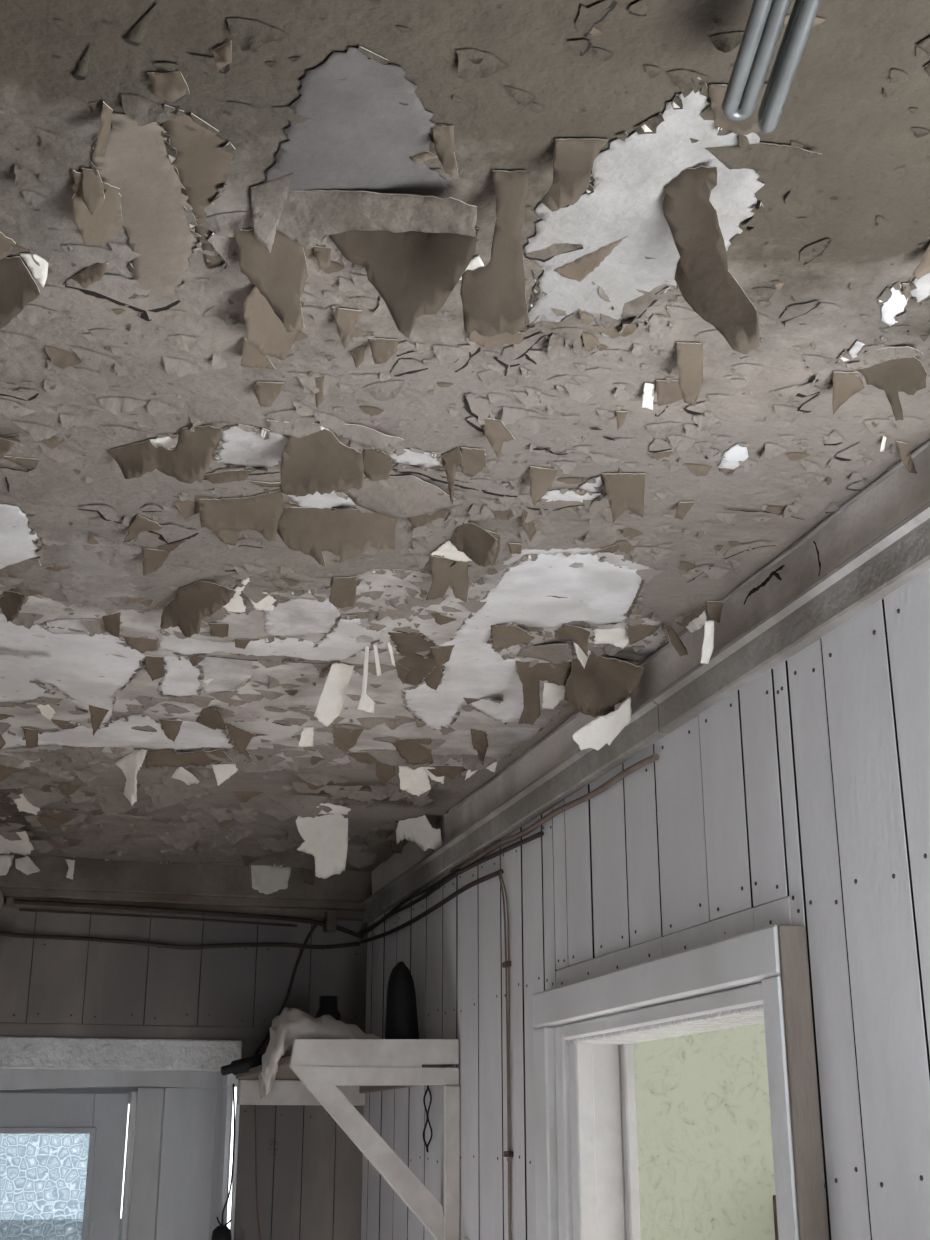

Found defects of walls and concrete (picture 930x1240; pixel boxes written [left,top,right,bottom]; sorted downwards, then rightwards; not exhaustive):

peeling [212,17,290,71]
peeling [709,18,744,53]
flaking render [0,46,930,894]